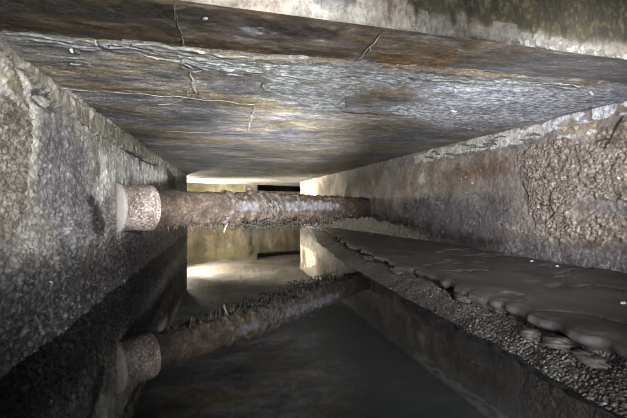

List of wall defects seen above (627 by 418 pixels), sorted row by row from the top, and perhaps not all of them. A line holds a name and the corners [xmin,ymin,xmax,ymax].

crack [173,2,184,46]
crack [597,116,624,148]
spalling [343,101,627,244]